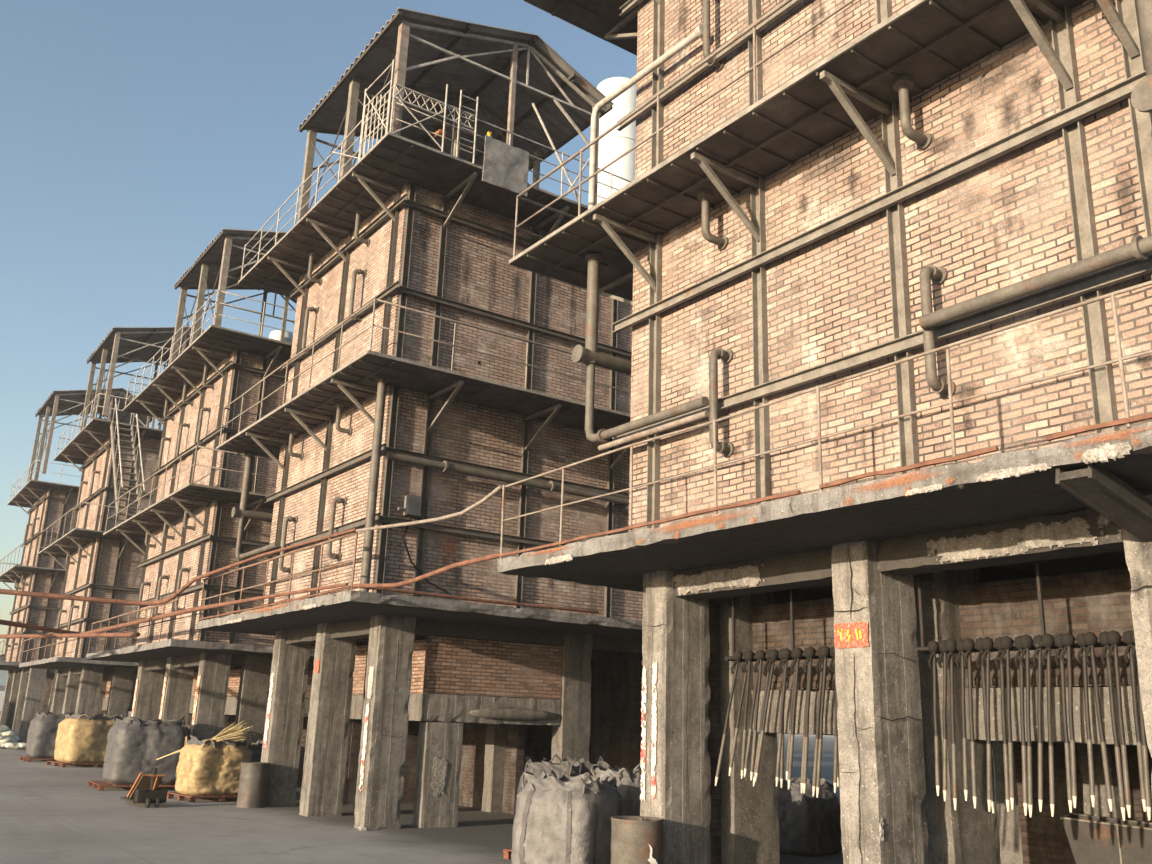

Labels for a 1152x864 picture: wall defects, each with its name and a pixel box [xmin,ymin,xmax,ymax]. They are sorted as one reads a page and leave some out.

spalling [1081,442,1132,464]
corrosion [864,474,924,492]
corrosion [666,516,730,538]
spalling [926,514,1111,564]
spalling [673,563,765,596]